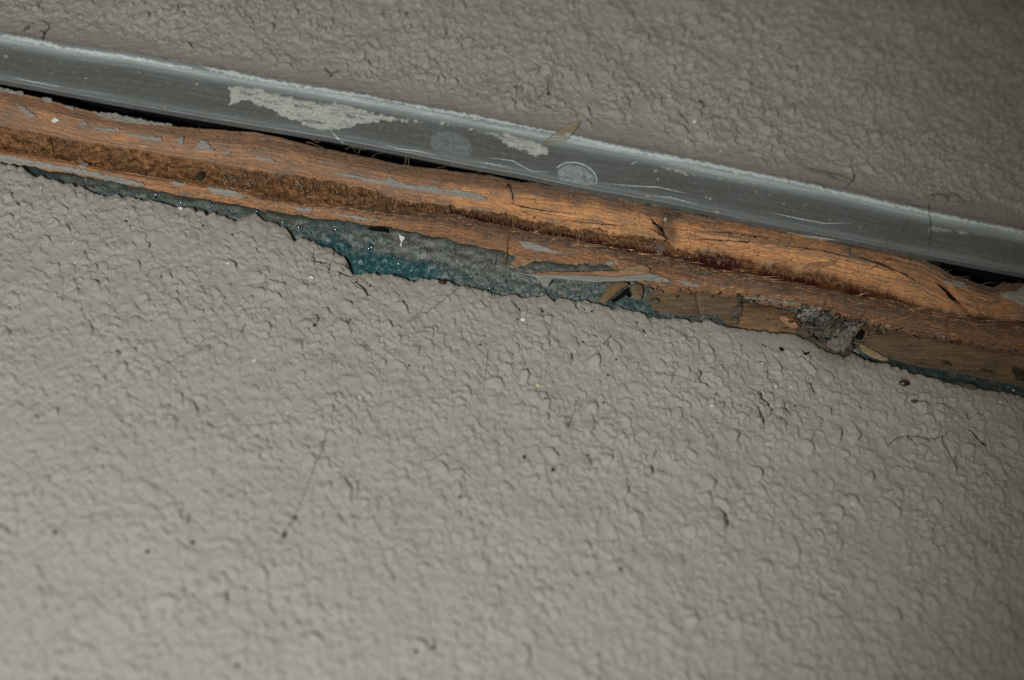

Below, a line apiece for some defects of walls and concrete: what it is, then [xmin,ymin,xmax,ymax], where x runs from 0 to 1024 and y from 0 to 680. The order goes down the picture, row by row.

peeling [0,87,36,118]
peeling [77,111,184,145]
peeling [0,154,144,187]
peeling [205,186,246,198]
peeling [332,172,513,223]
peeling [285,205,379,221]
peeling [519,240,562,253]
spalling [693,253,743,268]
peeling [647,276,702,288]
peeling [1000,286,1024,305]
peeling [746,296,822,314]